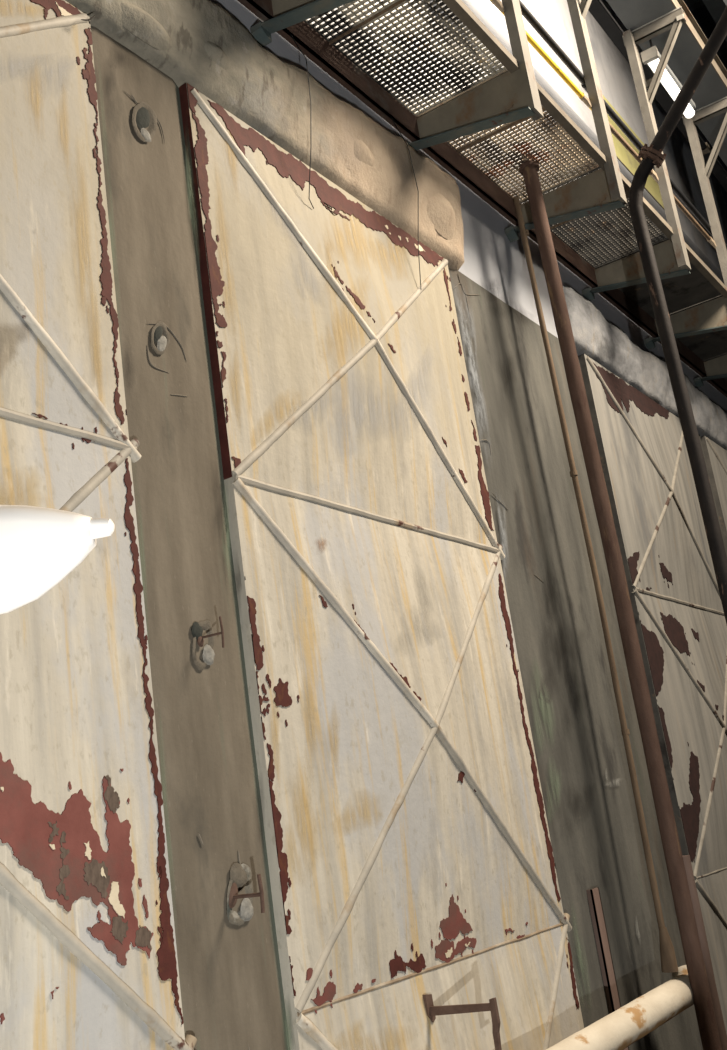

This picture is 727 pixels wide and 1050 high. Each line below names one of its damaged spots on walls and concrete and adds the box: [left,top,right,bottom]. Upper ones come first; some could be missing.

peeling [30,0,81,20]
peeling [76,28,127,425]
peeling [187,83,462,423]
peeling [459,374,494,531]
peeling [627,552,652,595]
peeling [658,555,673,588]
peeling [0,458,184,1025]
peeling [247,596,300,934]
peeling [638,612,699,780]
peeling [679,742,701,863]
peeling [289,956,336,1014]
peeling [389,883,477,979]